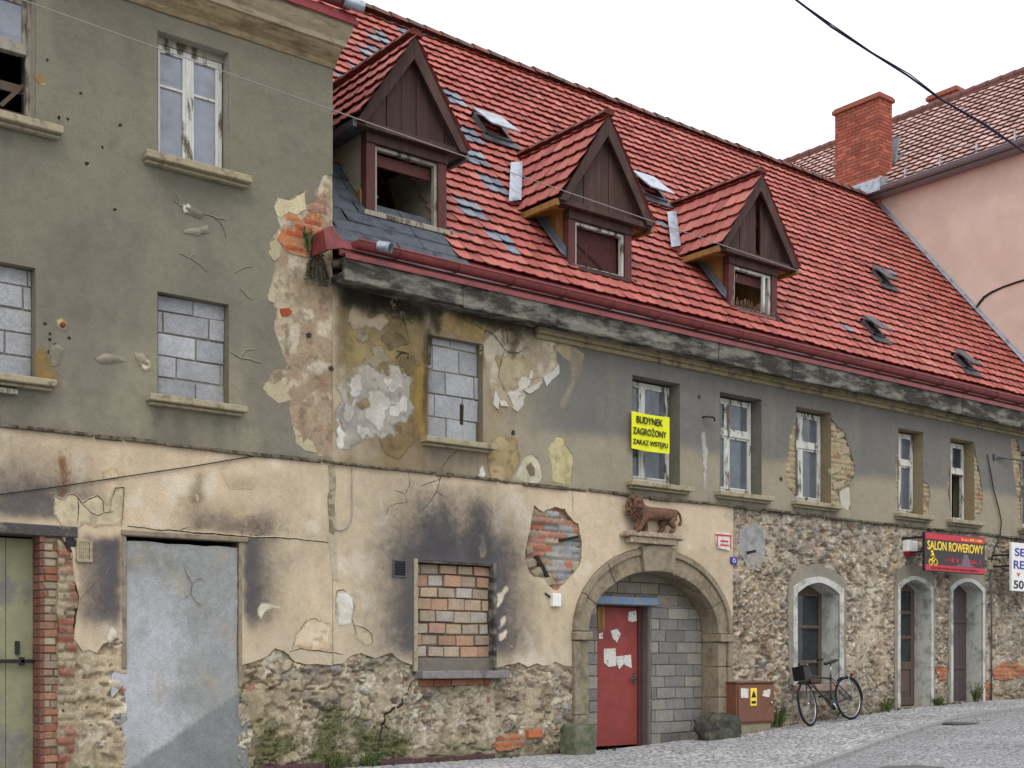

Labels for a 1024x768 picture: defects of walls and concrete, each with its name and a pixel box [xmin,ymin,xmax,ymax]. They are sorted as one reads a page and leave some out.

peeling [438,310,584,412]
spalling [263,174,415,650]
crack [386,450,458,513]
spalling [827,422,854,511]
spalling [524,507,581,590]
flaking render [492,733,525,751]